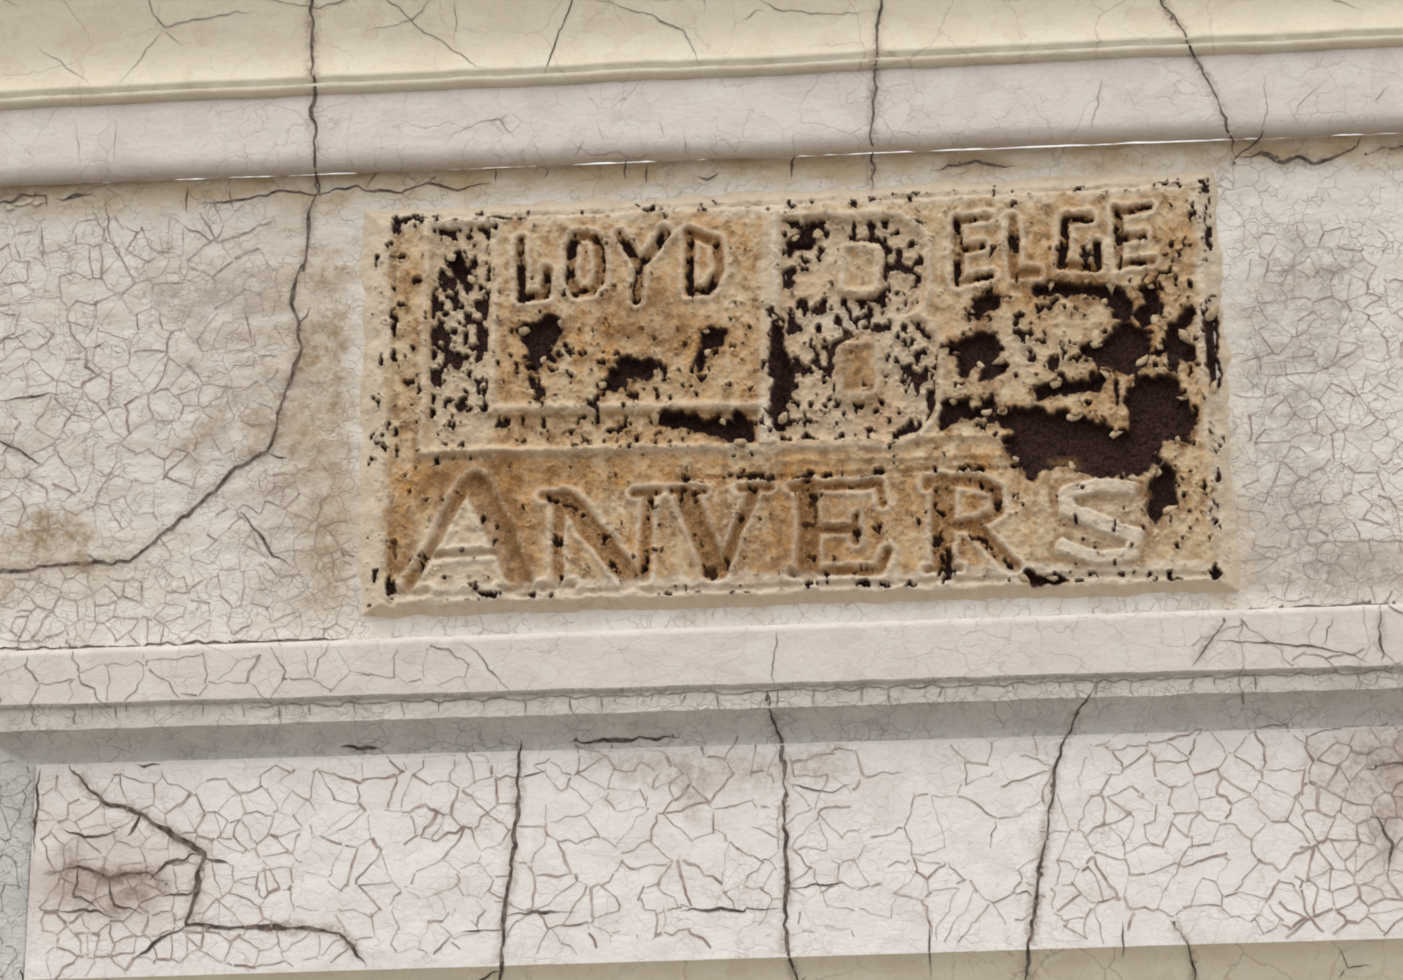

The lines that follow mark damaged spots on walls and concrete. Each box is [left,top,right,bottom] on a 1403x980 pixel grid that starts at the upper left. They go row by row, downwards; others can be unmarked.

crack [1160,0,1403,165]
crack [940,159,1014,170]
spalling [786,222,824,259]
spalling [515,313,564,375]
spalling [597,354,659,393]
spalling [650,408,756,450]
spalling [694,325,728,373]
spalling [766,307,797,433]
spalling [937,279,1224,525]
crack [0,0,901,980]
spalling [1018,568,1070,588]
crack [825,219,1403,980]